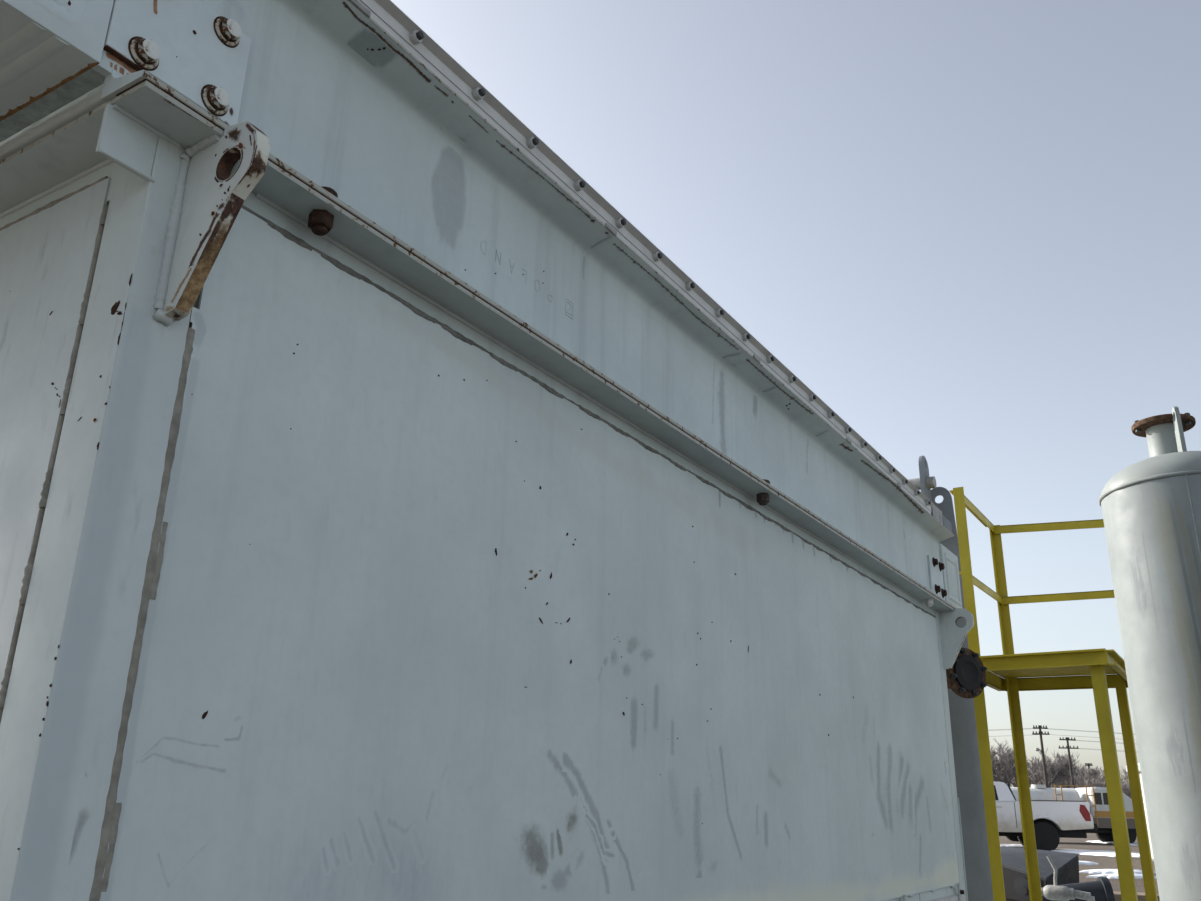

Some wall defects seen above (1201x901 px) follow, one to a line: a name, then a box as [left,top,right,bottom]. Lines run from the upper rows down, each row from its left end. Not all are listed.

corrosion [151,0,159,16]
corrosion [0,45,266,314]